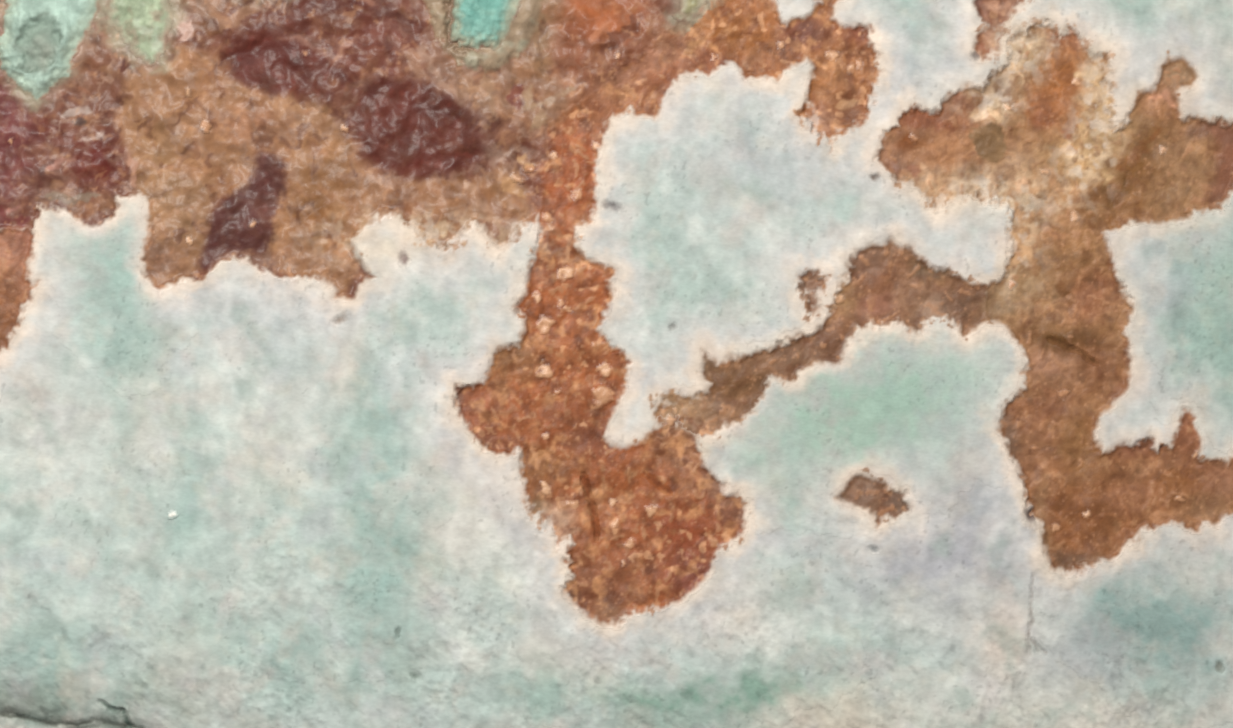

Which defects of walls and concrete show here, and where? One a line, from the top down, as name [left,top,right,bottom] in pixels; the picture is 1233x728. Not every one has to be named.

corrosion [0,226,42,355]
spalling [0,0,680,328]
corrosion [450,0,1233,630]
spalling [868,172,883,184]